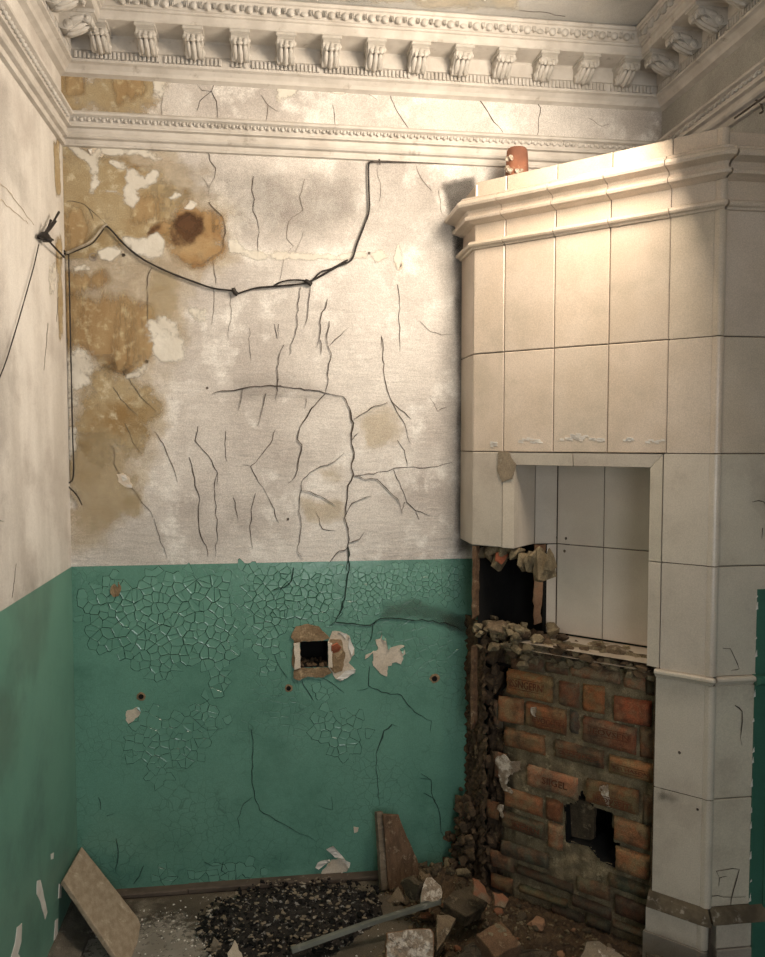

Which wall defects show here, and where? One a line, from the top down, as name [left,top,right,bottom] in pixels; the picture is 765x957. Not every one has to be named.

crack [0,183,34,225]
crack [198,153,251,359]
crack [281,179,305,275]
damp [49,140,191,469]
crack [108,285,465,641]
flaking render [291,624,406,681]
crack [275,657,431,730]
crack [237,730,312,839]
crack [376,724,392,805]
peeling [11,923,22,957]
peeling [36,880,58,940]
crack [712,868,740,906]